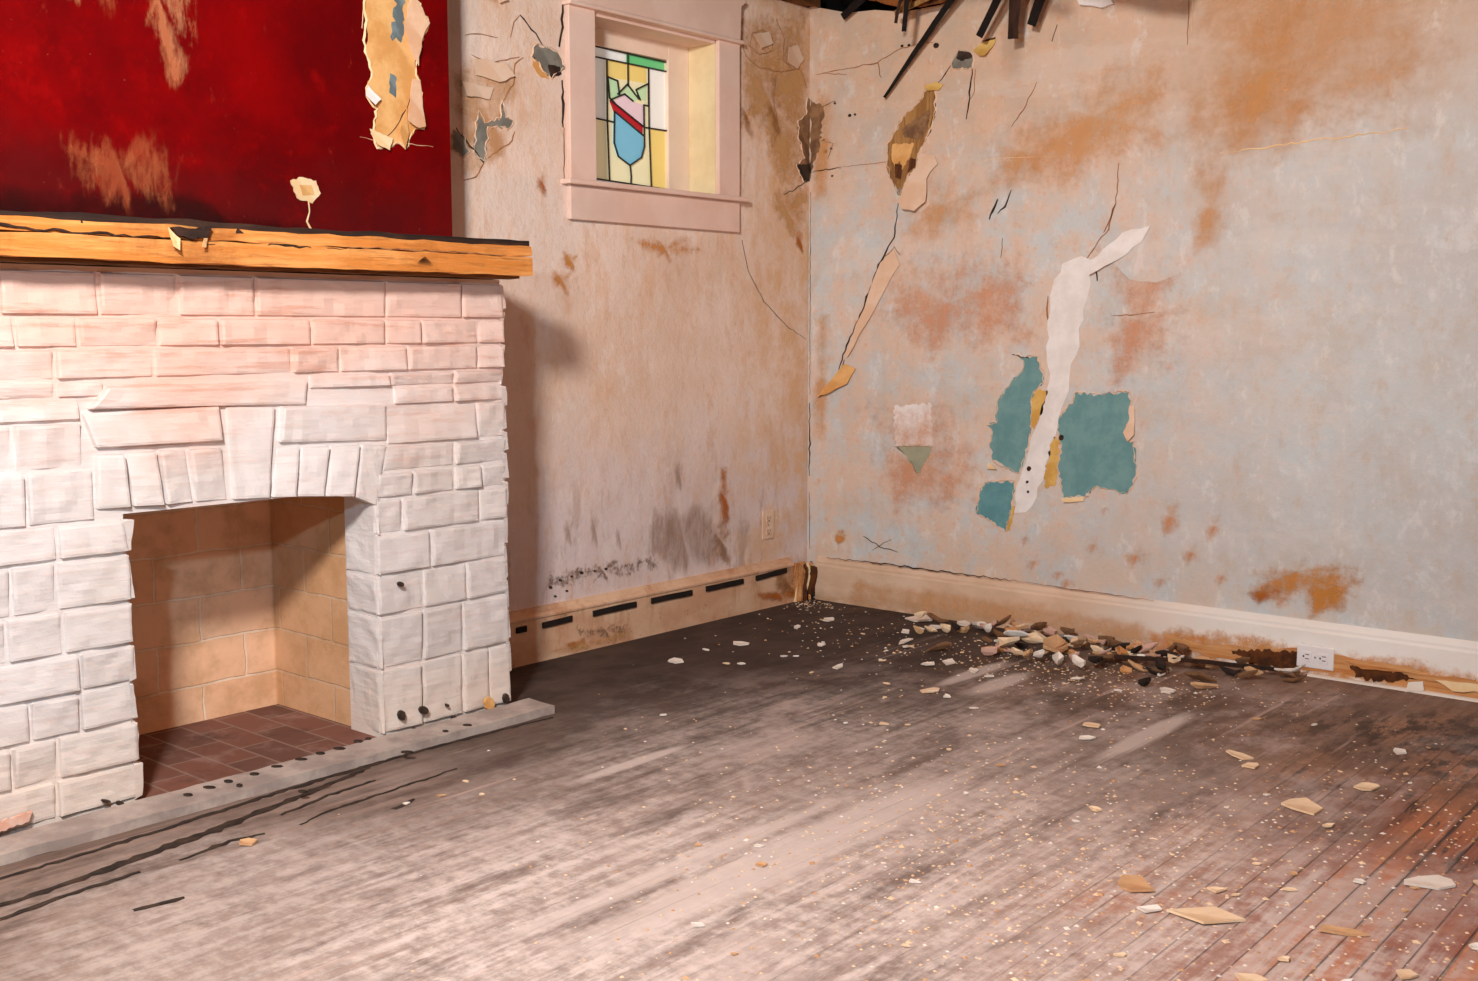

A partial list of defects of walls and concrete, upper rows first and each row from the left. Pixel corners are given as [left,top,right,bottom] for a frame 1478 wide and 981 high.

peeling [362,0,433,150]
spalling [451,15,566,181]
crack [817,42,933,77]
spalling [886,37,996,211]
peeling [1088,226,1150,275]
crack [742,162,1153,601]
peeling [976,353,1138,532]
water stain [548,559,654,586]